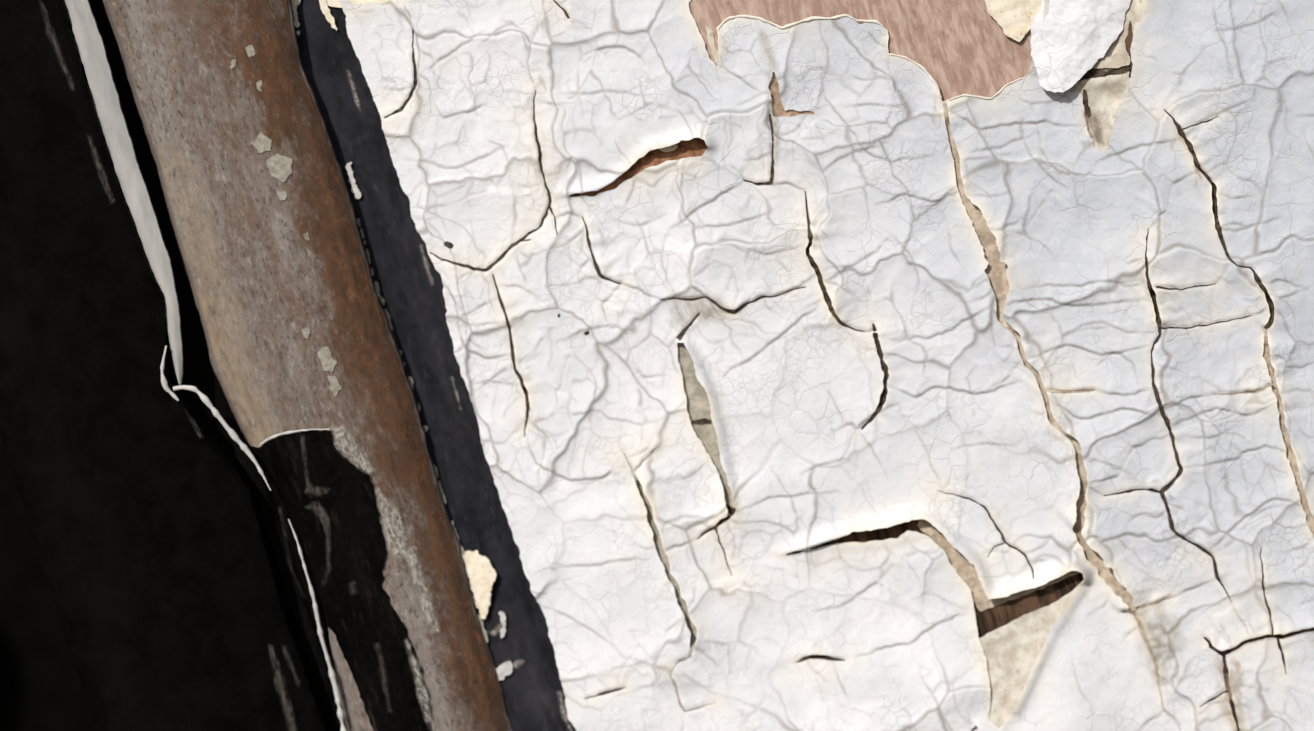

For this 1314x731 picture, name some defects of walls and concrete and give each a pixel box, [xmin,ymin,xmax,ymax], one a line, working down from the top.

crack [384,29,417,118]
peeling [569,137,708,197]
crack [743,114,774,185]
peeling [689,0,1146,151]
crack [429,90,622,437]
crack [660,191,889,429]
peeling [677,343,736,517]
crack [786,103,1314,731]
crack [585,687,626,699]
crack [623,445,716,712]
crack [697,504,736,576]
peeling [971,568,1165,731]